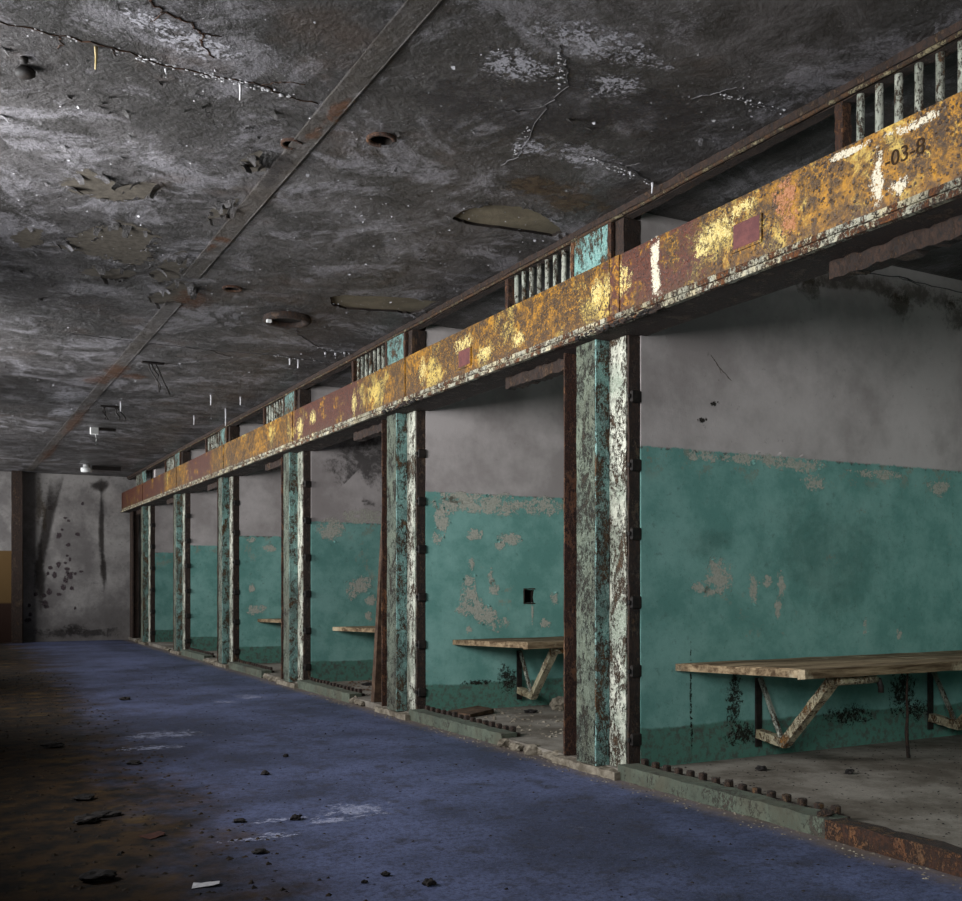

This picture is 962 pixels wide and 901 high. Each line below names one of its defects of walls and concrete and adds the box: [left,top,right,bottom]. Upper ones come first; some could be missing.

crack [0,0,318,104]
crack [501,45,606,166]
peeling [59,160,169,203]
crack [585,156,652,185]
rust [772,173,799,238]
peeling [0,200,229,316]
rust [263,311,312,329]
rust [575,302,663,342]
damp [36,491,58,603]
damp [93,481,107,584]
peeling [431,491,562,545]
damp [725,674,755,746]